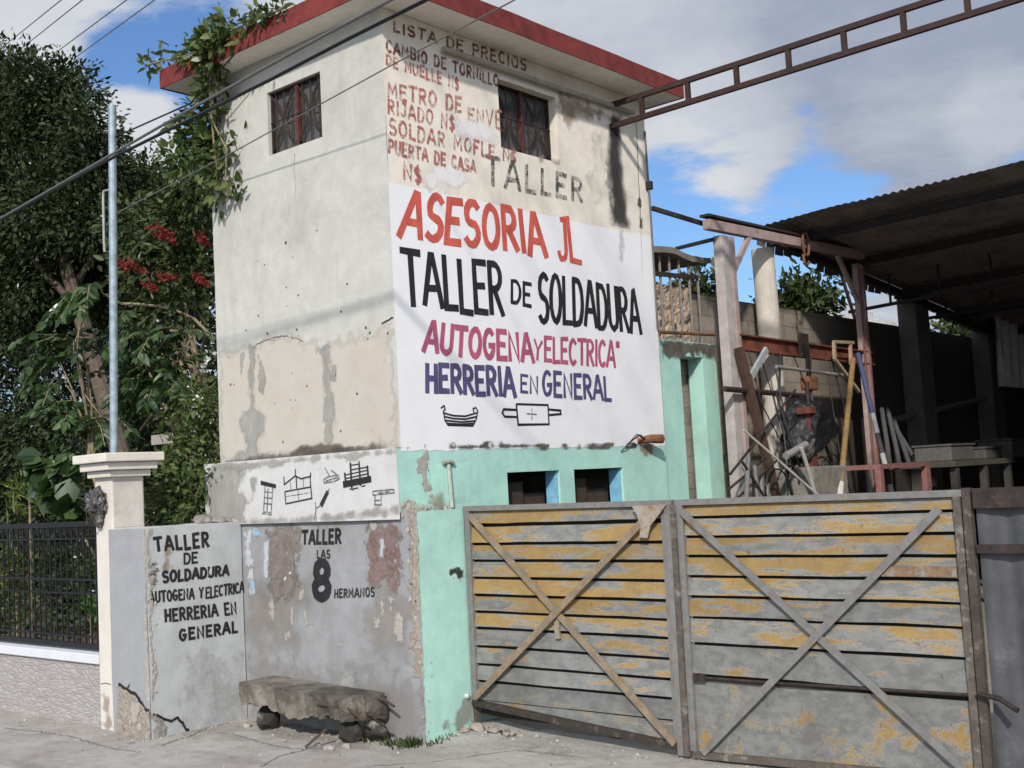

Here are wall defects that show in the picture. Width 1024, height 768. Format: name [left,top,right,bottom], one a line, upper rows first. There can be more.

water stain [607,115,628,227]
peeling [450,441,613,450]
spalling [142,529,158,701]
peeling [244,524,303,603]
peeling [363,444,473,743]
crack [101,683,190,731]